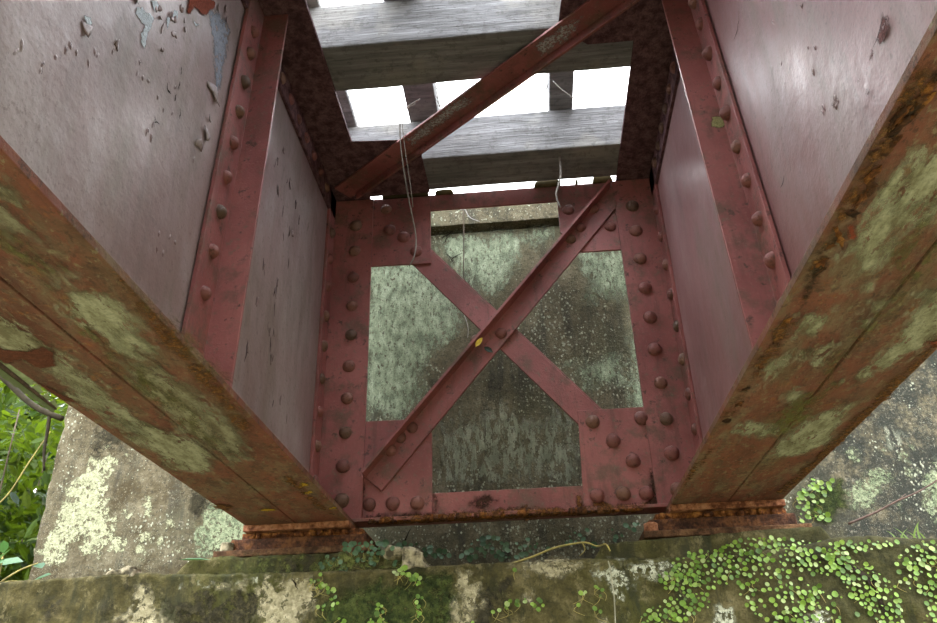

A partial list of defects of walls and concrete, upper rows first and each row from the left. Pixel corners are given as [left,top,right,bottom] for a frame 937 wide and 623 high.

peeling [135,0,199,47]
peeling [207,4,231,107]
corrosion [0,347,56,369]
corrosion [117,278,250,431]
corrosion [38,383,79,403]
leakage [0,292,253,473]
leakage [115,582,170,623]
leakage [207,554,322,623]
leakage [451,570,484,623]
leakage [523,558,582,578]
leakage [594,559,673,602]
leakage [713,605,734,623]